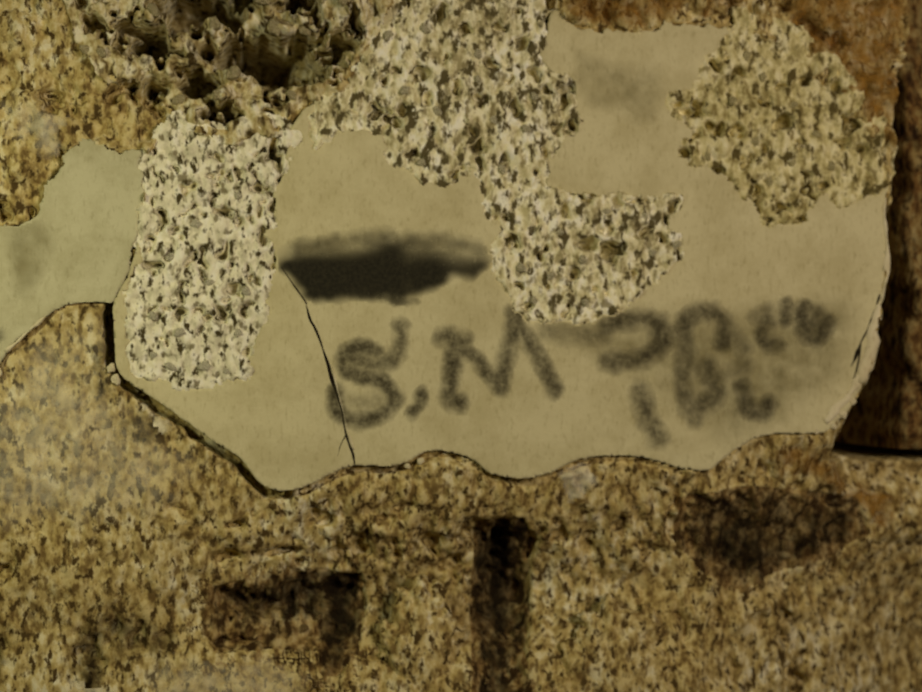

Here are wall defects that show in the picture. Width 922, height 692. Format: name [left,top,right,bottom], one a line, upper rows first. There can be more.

flaking render [0,0,898,491]
crack [284,271,355,465]
spalling [186,552,384,692]
spalling [450,509,558,692]
spalling [652,480,882,599]